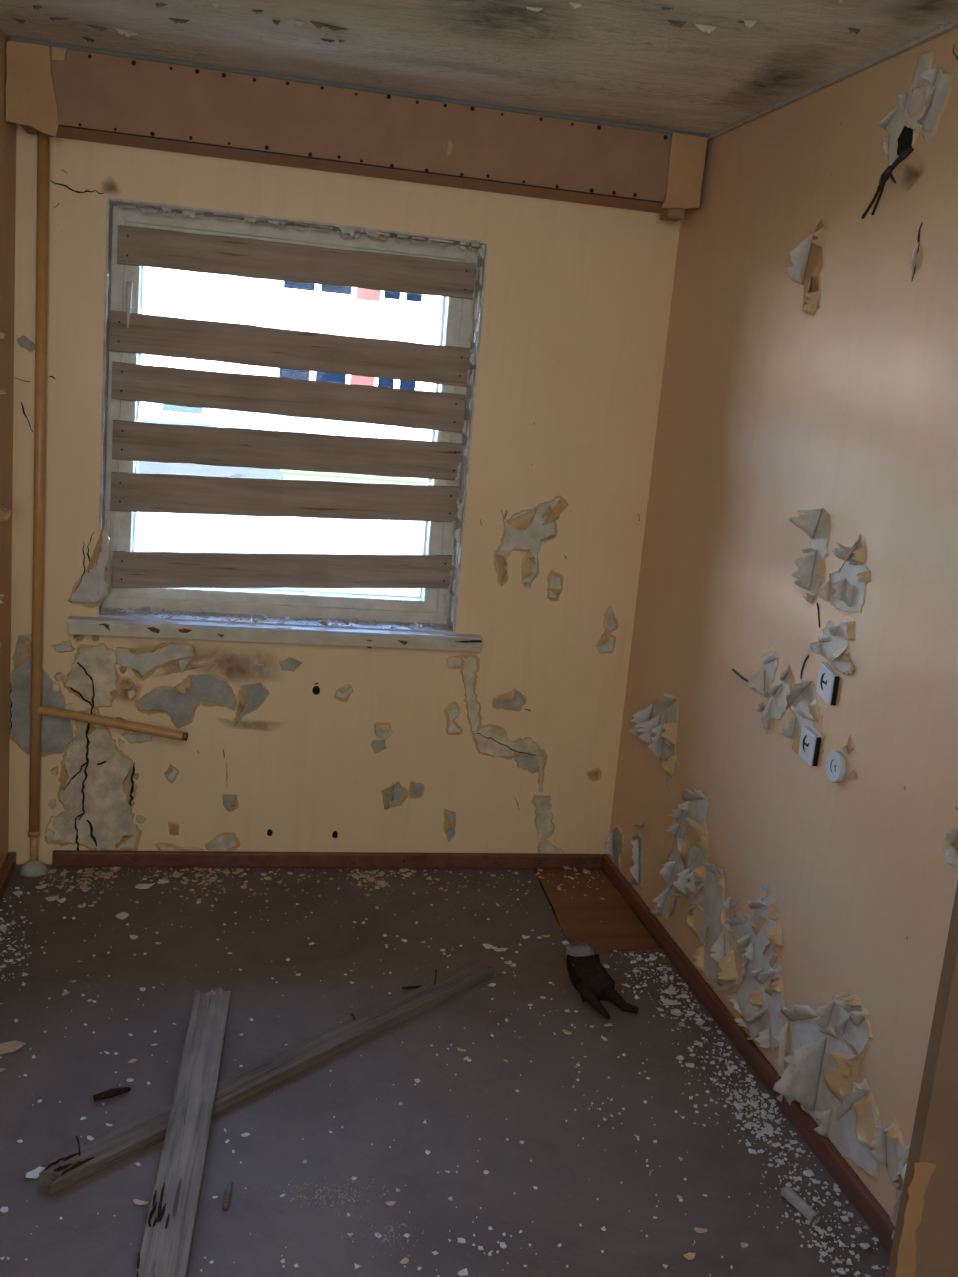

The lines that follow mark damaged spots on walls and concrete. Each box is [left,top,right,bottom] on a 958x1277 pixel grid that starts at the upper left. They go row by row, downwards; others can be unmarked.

spalling [877,50,955,169]
peeling [787,218,829,317]
peeling [114,201,486,625]
peeling [67,517,111,608]
peeling [493,496,569,602]
peeling [745,507,871,754]
spalling [0,623,303,851]
peeling [371,722,393,753]
peeling [381,781,425,810]
peeling [443,640,564,854]
peeling [603,822,645,890]
peeling [629,693,910,1227]